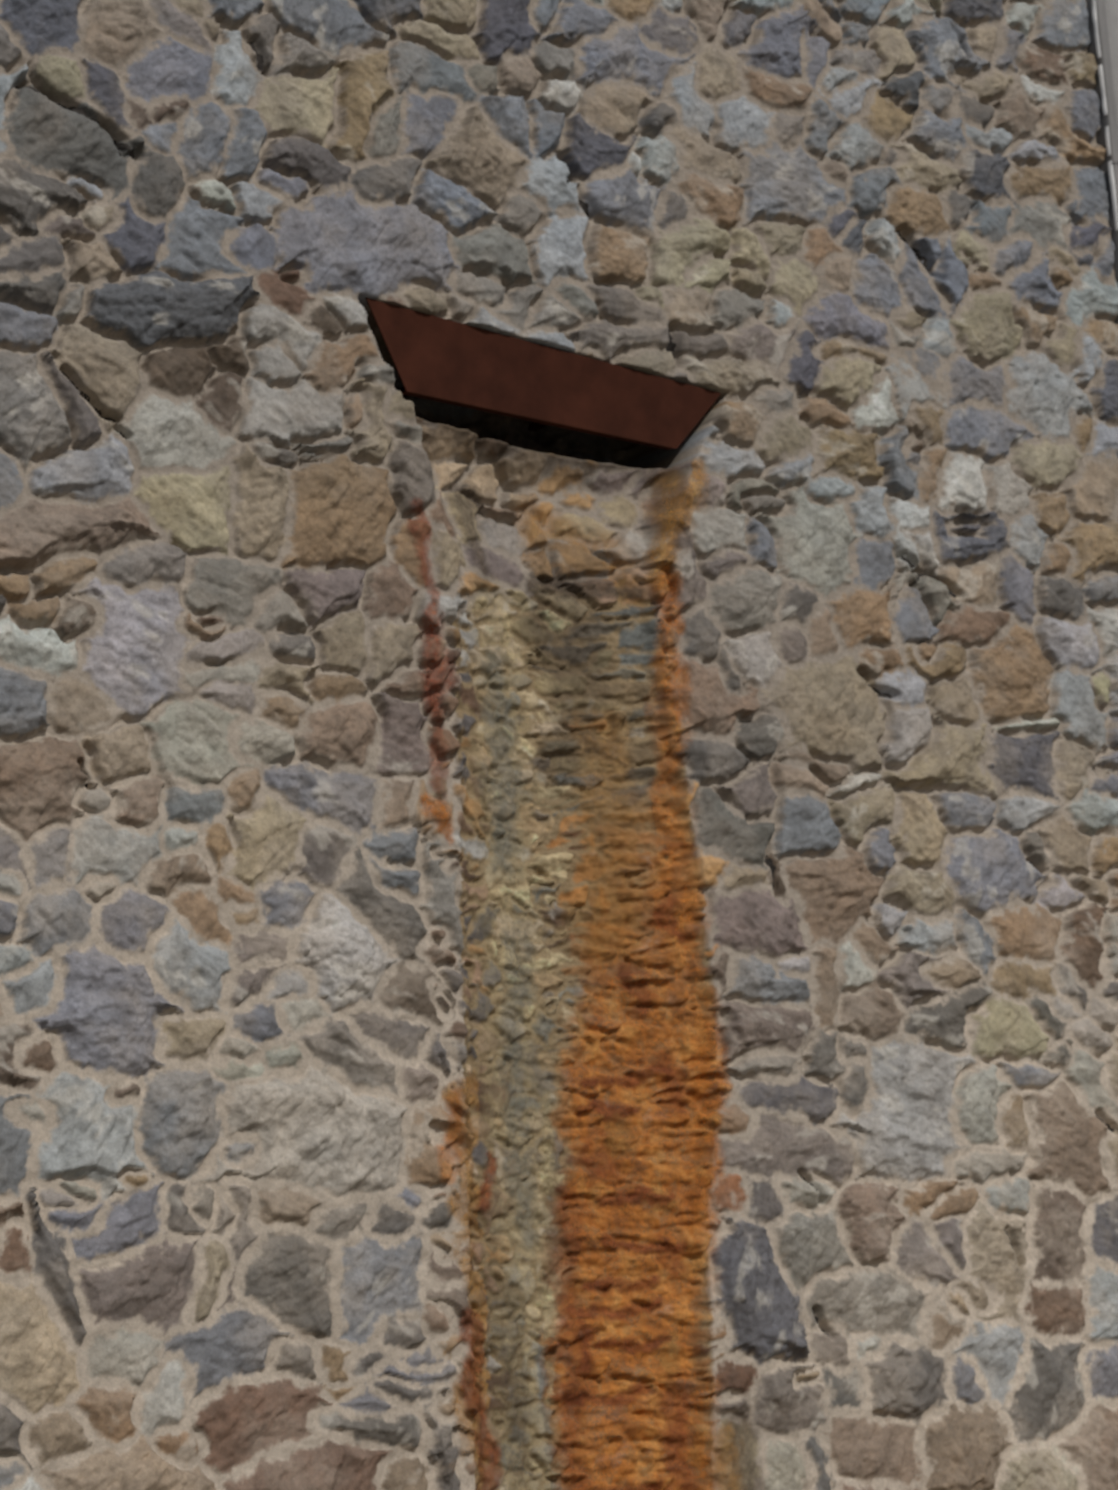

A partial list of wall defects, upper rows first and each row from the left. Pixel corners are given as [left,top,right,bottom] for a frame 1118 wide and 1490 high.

rust [412,500,453,711]
rust [549,464,726,1490]
rust [456,1259,499,1484]